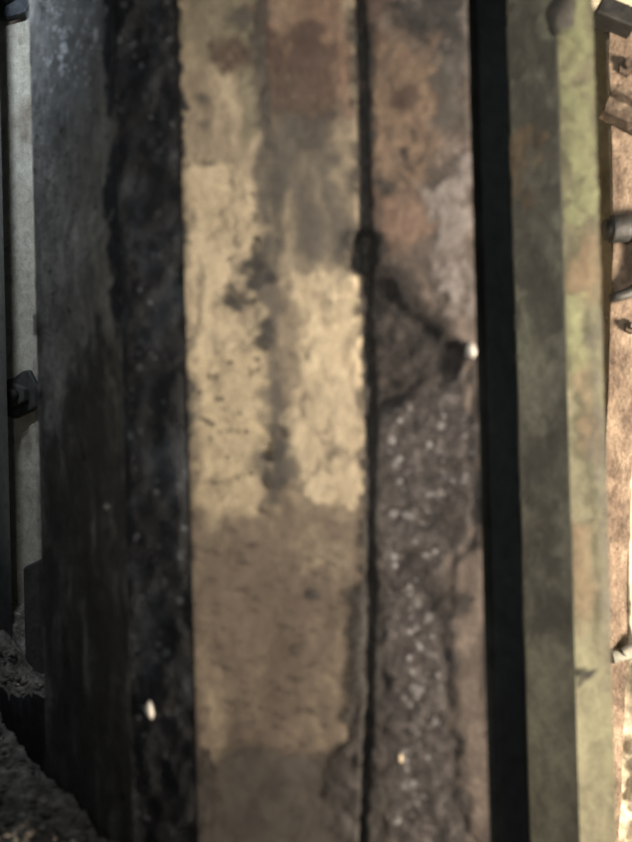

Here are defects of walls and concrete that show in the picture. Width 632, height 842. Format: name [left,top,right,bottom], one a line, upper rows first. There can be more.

water stain [179,0,360,349]
water stain [414,153,475,315]
spalling [145,700,154,719]
water stain [190,362,364,817]